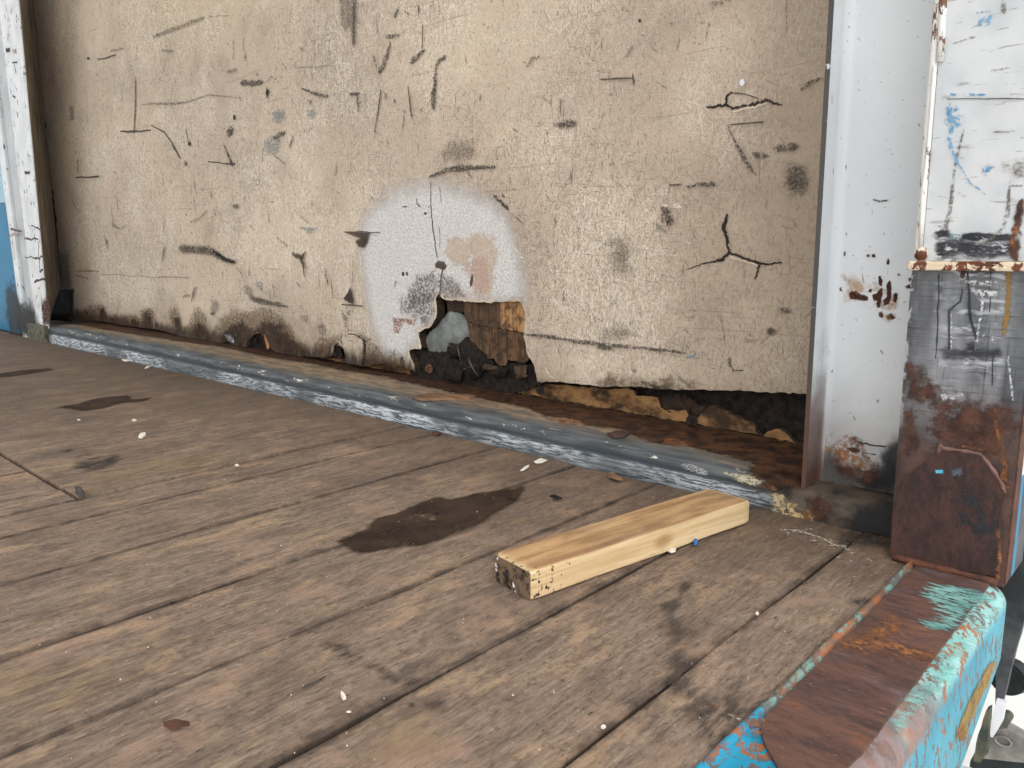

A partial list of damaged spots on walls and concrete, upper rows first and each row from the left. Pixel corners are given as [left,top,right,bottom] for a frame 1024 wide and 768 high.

crack [706,92,782,113]
crack [689,214,782,279]
leakage [76,305,155,329]
leakage [169,281,302,354]
corrosion [840,274,911,320]
corrosion [73,321,803,490]
corrosion [823,362,1021,491]
leakage [339,486,524,552]
corrosion [843,616,949,665]
corrosion [956,646,1001,741]